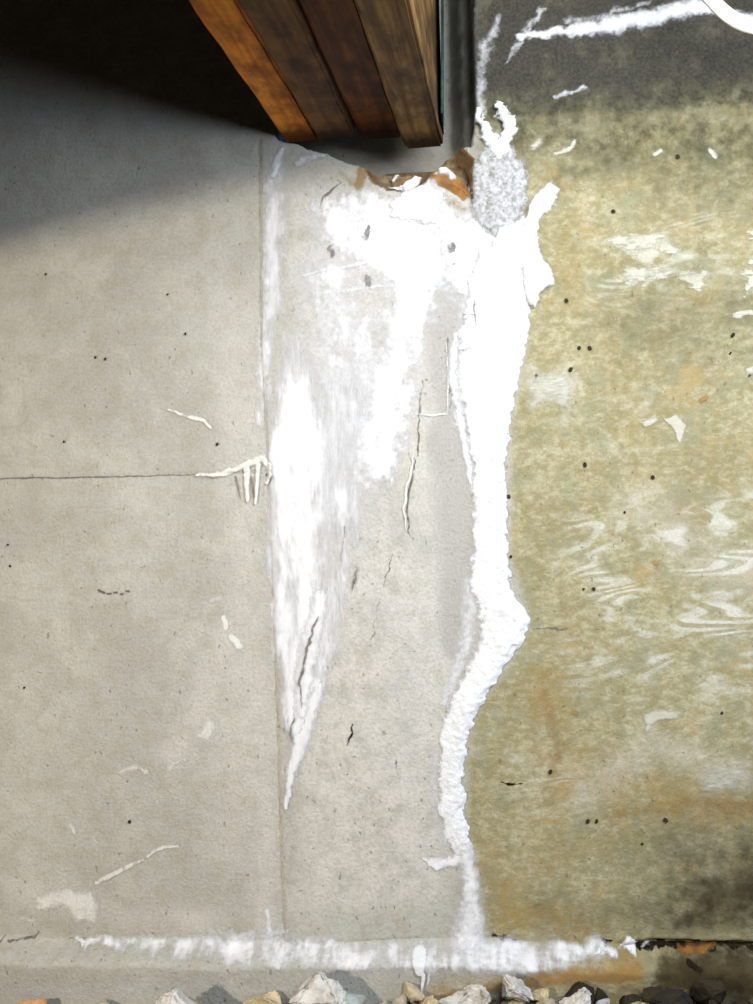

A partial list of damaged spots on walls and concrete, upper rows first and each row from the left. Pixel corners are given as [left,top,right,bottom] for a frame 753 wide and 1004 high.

leakage [474,82,518,159]
spalling [363,145,529,236]
crack [402,380,423,536]
crack [341,526,358,591]
leakage [75,147,648,1004]
crack [290,616,319,743]
leakage [700,872,753,913]